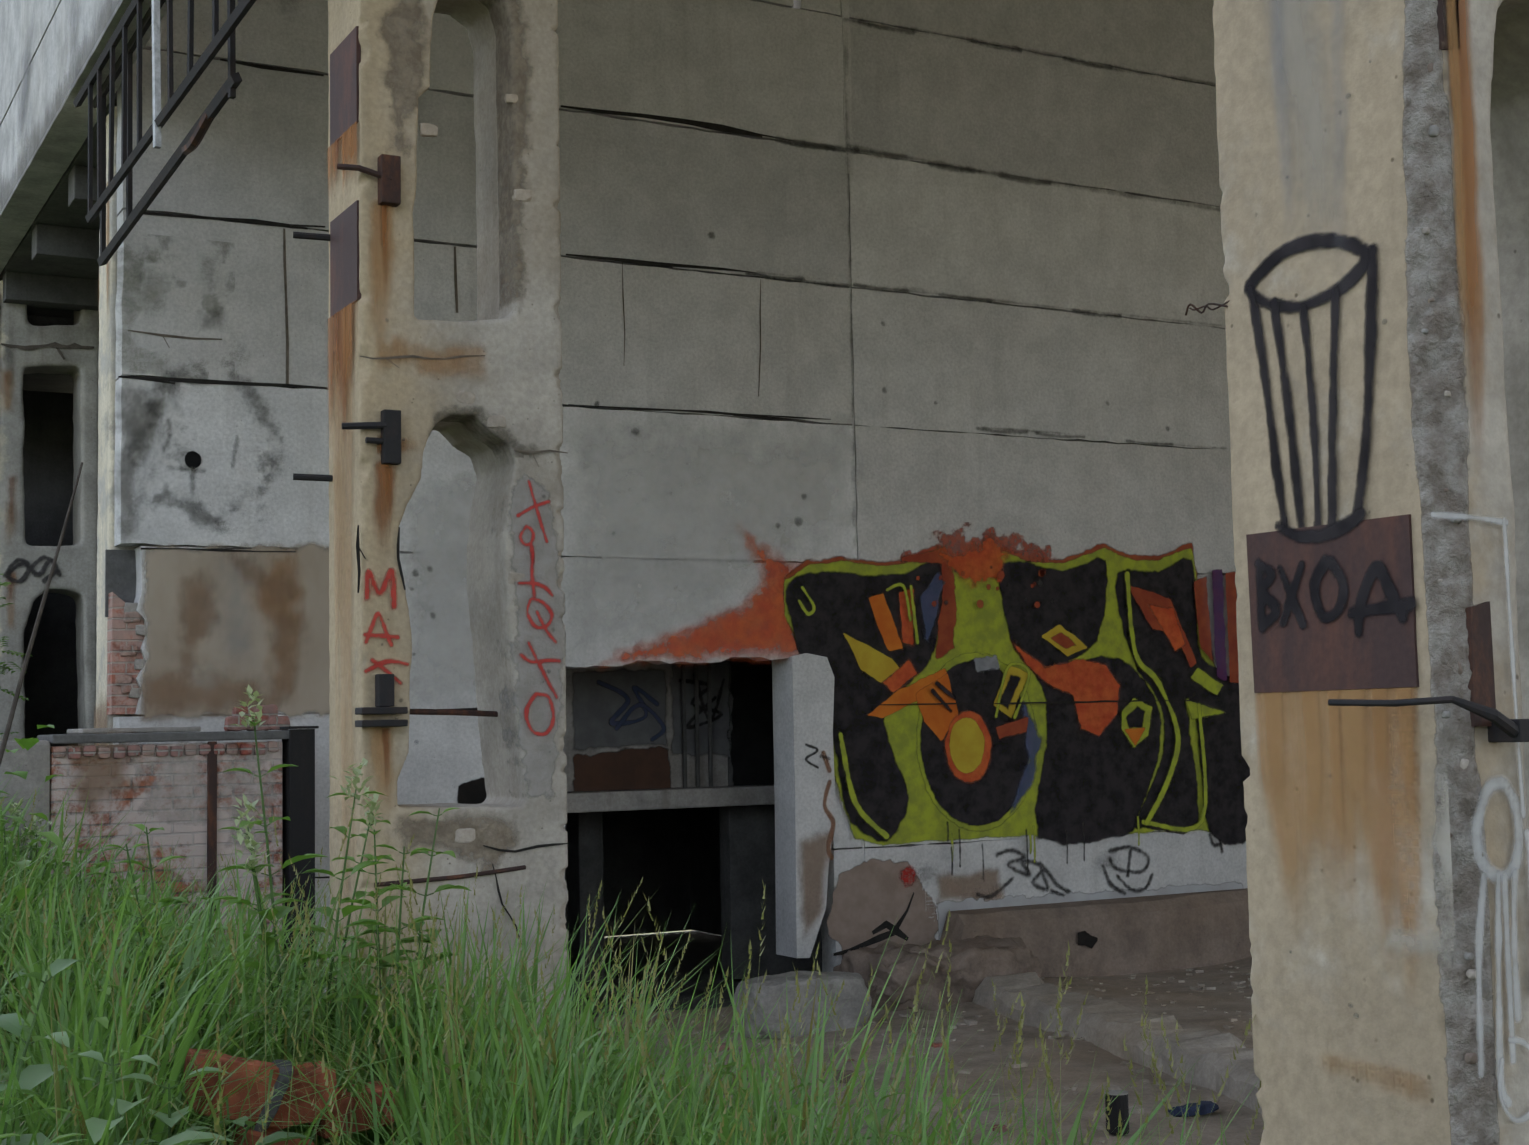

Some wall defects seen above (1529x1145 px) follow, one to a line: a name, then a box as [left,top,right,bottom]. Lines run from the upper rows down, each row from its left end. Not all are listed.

corrosion [328,121,357,185]
corrosion [373,202,391,285]
corrosion [1447,0,1481,346]
corrosion [328,303,352,407]
damp [115,399,158,513]
corrosion [376,437,393,527]
spalling [105,549,147,715]
damp [142,543,330,719]
spalling [1402,0,1500,1145]
corrosion [1257,688,1419,927]